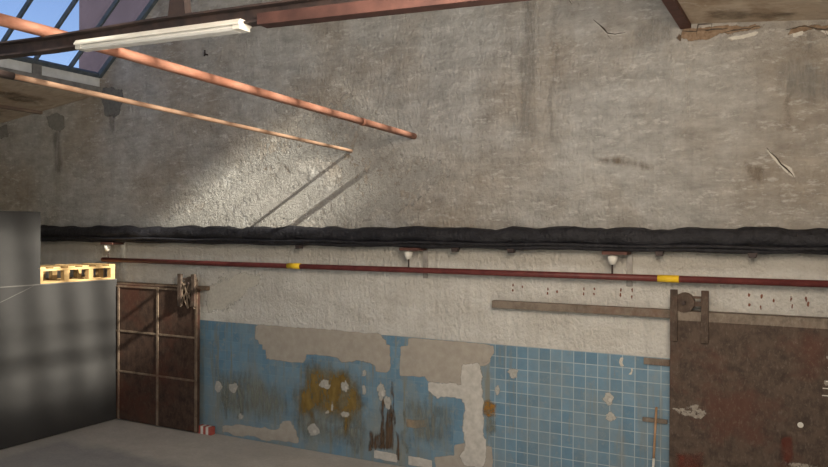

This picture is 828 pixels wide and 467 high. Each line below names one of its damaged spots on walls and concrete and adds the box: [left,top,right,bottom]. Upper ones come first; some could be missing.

crack [594,20,625,39]
flaking render [677,24,761,41]
flaking render [788,24,828,38]
peeling [255,324,494,395]
rust [299,368,360,434]
peeling [377,382,392,410]
flaking render [222,413,299,443]
peeling [307,423,320,436]
rust [483,401,495,432]
peeling [374,450,397,463]
peeling [408,443,493,467]